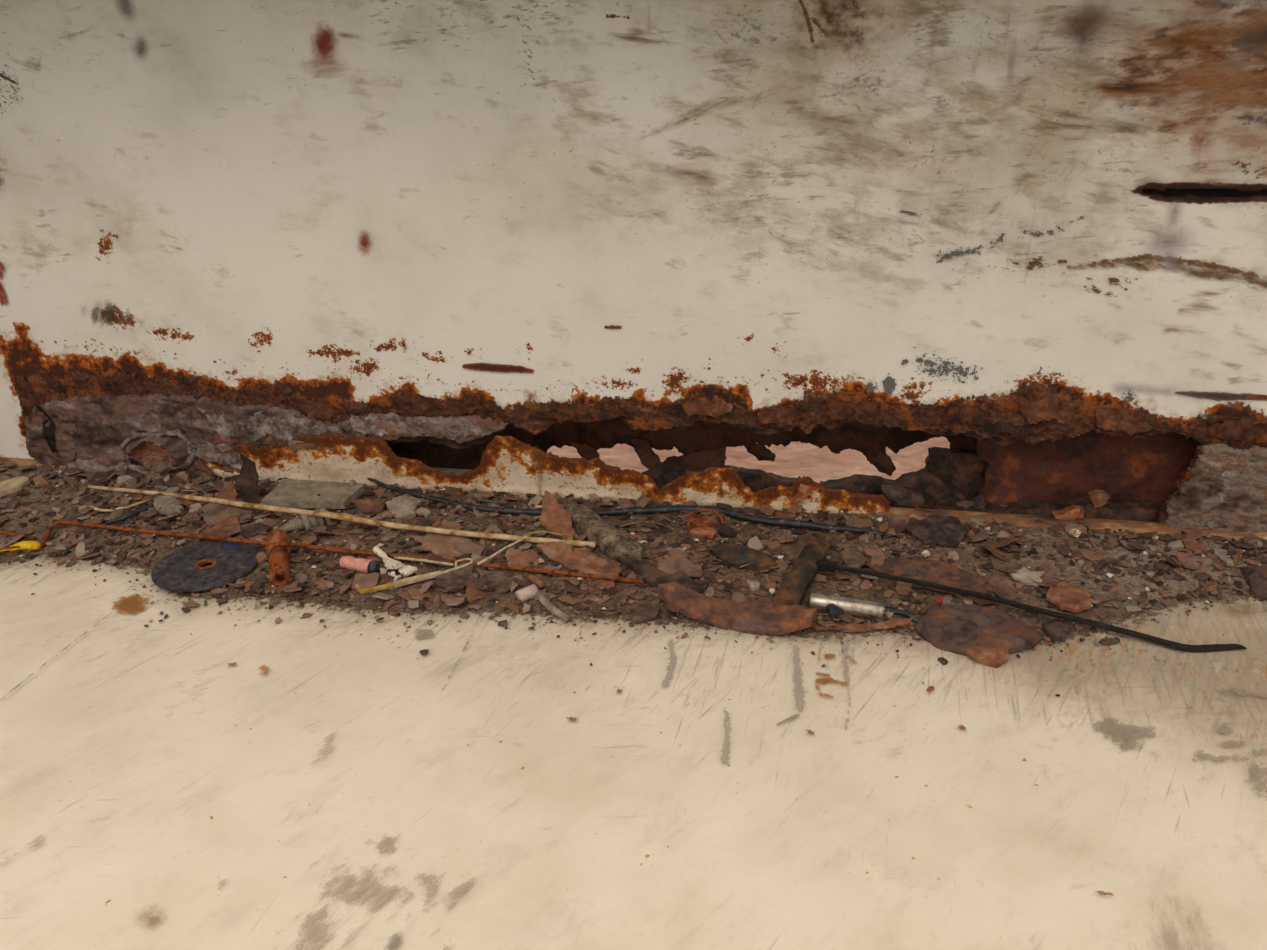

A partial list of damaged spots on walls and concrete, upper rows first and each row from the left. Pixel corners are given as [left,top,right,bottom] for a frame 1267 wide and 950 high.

rust [798,0,864,48]
rust [1097,0,1267,146]
rust [1225,141,1266,186]
rust [95,229,119,264]
rust [994,254,1067,274]
rust [1092,254,1259,278]
peeling [865,373,896,395]
peeling [901,347,983,384]
rust [0,305,1267,594]
rust [112,594,149,616]